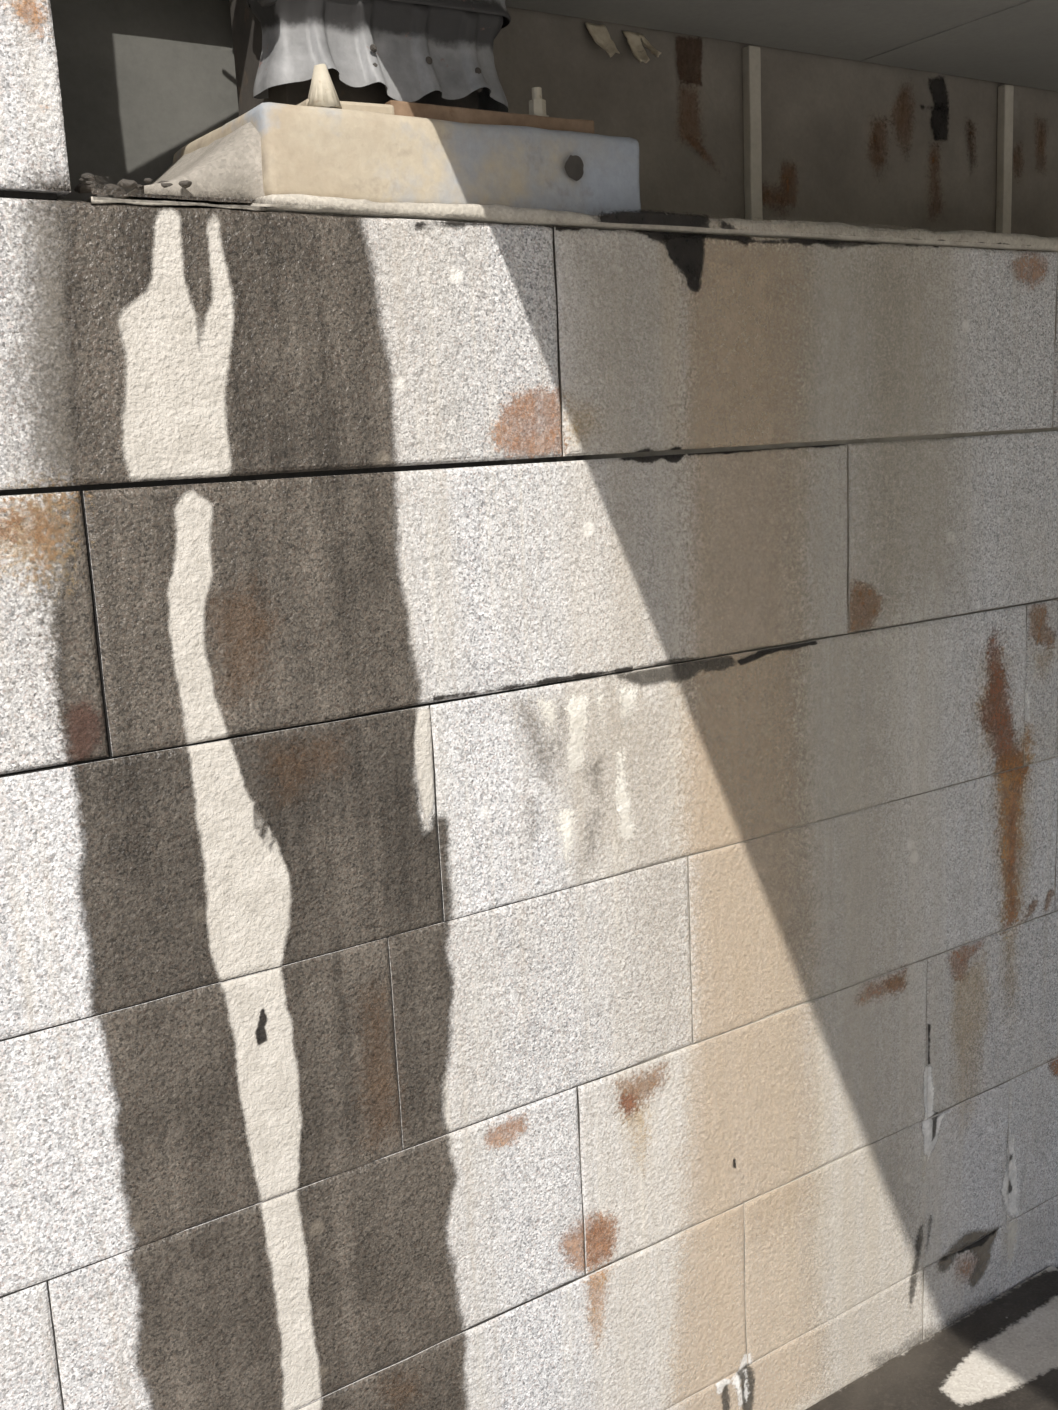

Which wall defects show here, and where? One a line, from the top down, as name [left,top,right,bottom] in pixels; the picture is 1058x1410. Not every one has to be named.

rust [676,36,713,162]
rust [492,389,579,459]
rust [3,494,69,566]
damp [38,173,844,1410]
rust [977,631,1054,938]
crack [925,1024,933,1064]
rust [616,1063,669,1114]
crack [931,1112,940,1141]
rust [559,1213,620,1311]
spalling [937,1228,998,1287]